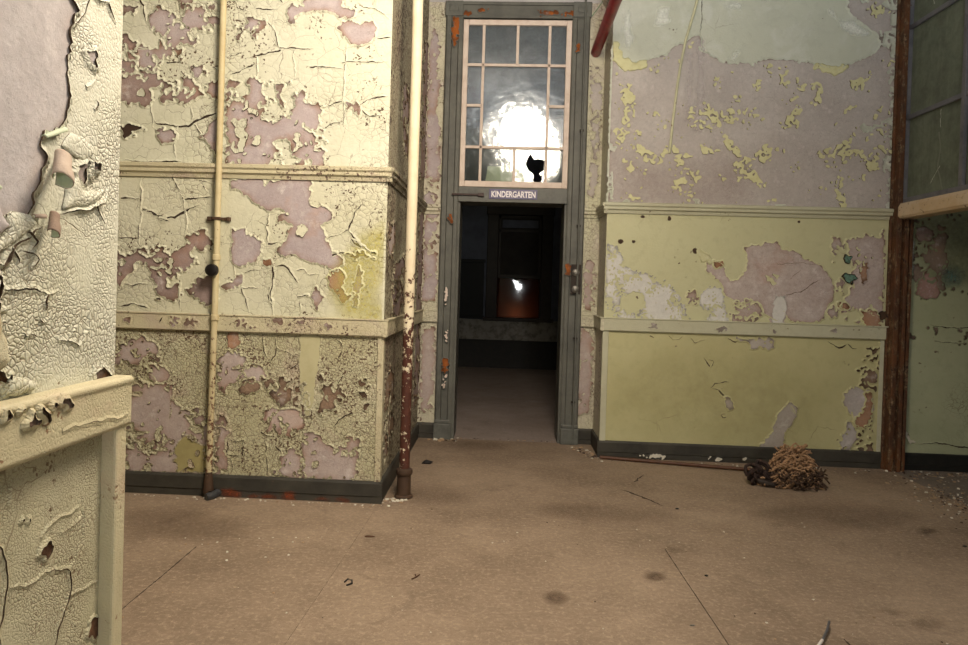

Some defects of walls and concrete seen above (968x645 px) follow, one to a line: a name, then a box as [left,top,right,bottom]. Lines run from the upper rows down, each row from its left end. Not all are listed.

peeling [0,0,103,218]
crack [75,0,117,27]
crack [138,0,148,25]
crack [212,0,391,130]
peeling [117,0,490,332]
peeling [585,0,897,208]
peeling [704,228,888,352]
crack [63,412,141,449]
peeling [89,315,232,475]
peeling [215,317,372,480]
crack [916,441,968,450]
crack [0,494,97,645]